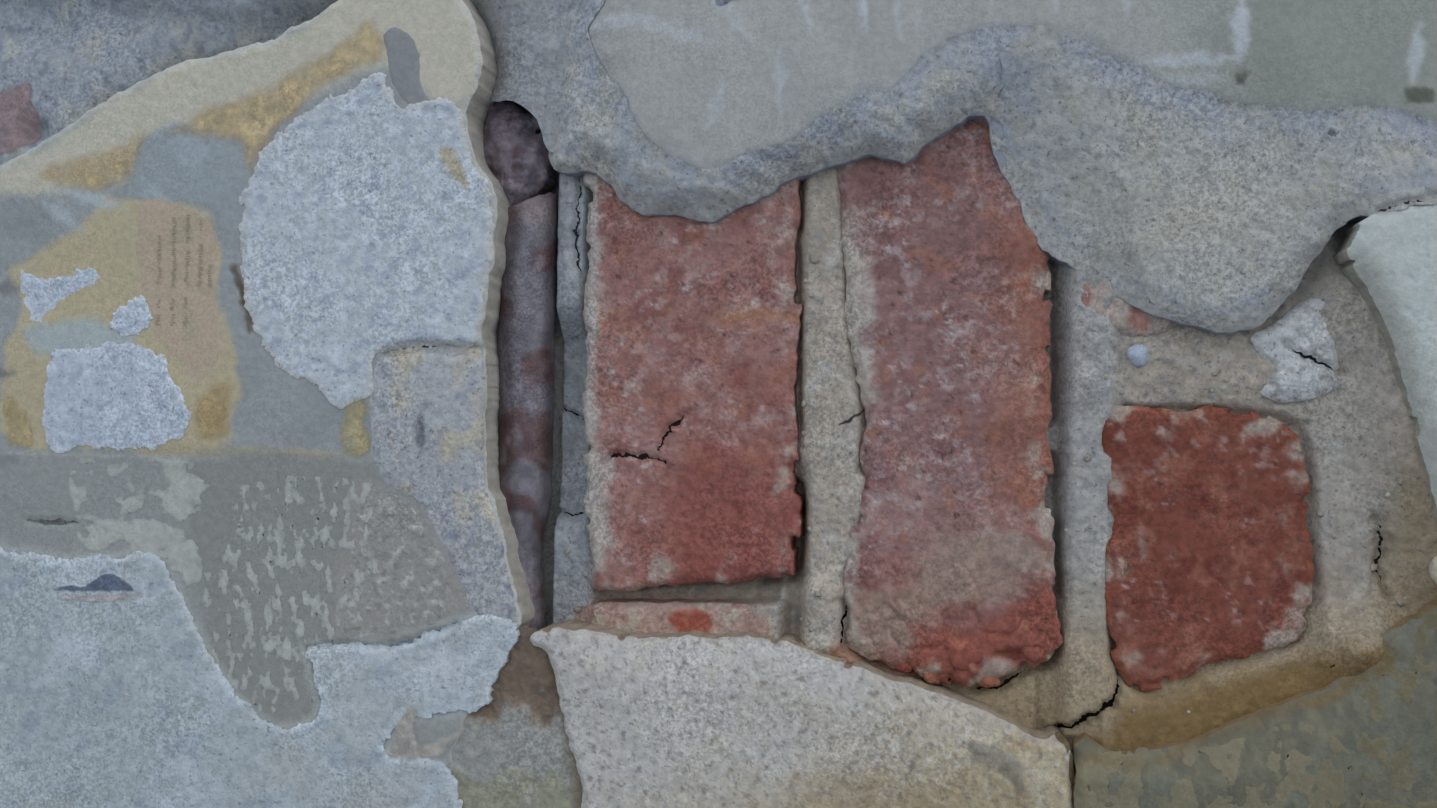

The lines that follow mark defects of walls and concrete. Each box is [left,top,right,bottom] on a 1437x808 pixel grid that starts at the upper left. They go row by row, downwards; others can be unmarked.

peeling [238,27,495,410]
spalling [470,0,1437,332]
peeling [41,295,382,714]
spalling [387,510,583,808]
crack [611,416,684,464]